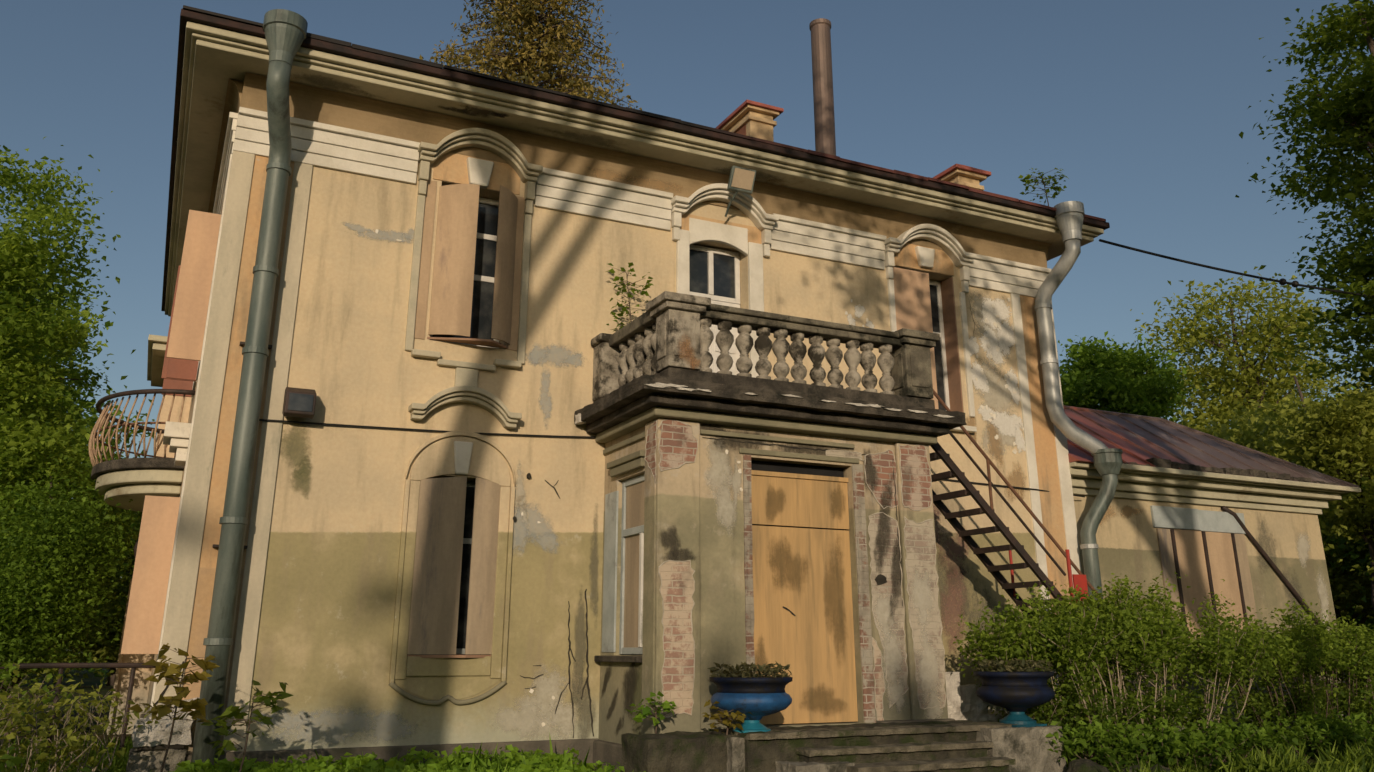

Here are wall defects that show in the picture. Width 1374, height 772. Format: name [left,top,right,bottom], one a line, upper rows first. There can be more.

peeling [845,299,875,328]
spalling [644,383,711,392]
spalling [782,394,953,418]
peeling [969,297,1026,454]
water stain [294,464,311,492]
flaking render [644,419,743,526]
flaking render [826,444,1009,722]
flaking render [658,560,695,718]